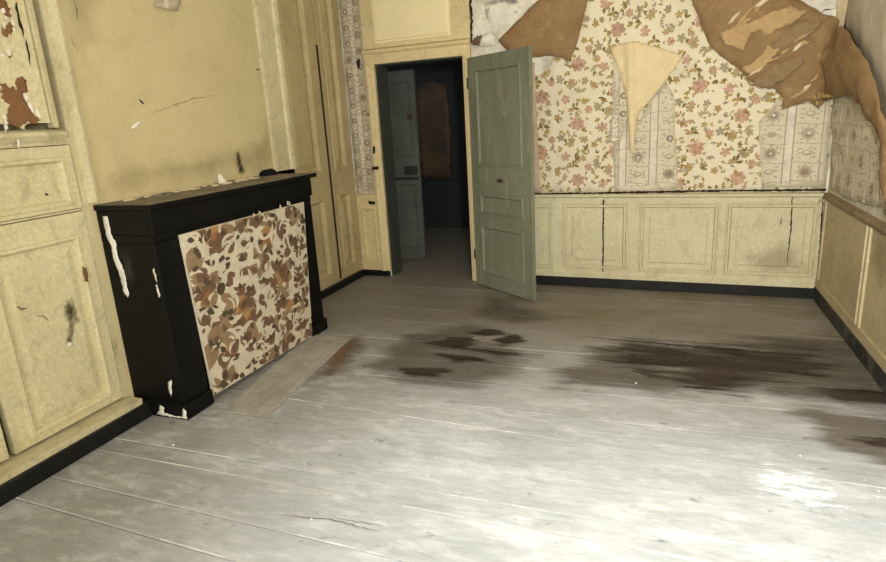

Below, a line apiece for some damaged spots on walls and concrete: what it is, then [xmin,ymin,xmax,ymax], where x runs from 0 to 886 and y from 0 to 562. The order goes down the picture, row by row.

peeling [0,0,31,66]
peeling [0,76,41,132]
peeling [103,216,129,298]
crack [535,189,826,272]
water stain [376,328,525,384]
water stain [557,335,886,403]
water stain [799,410,886,464]